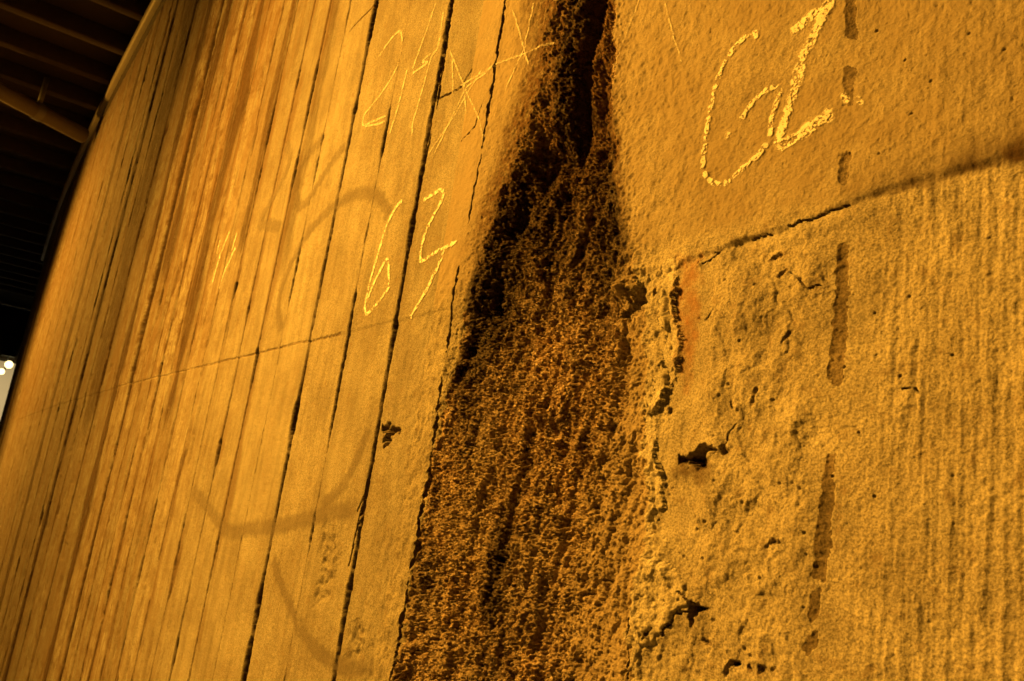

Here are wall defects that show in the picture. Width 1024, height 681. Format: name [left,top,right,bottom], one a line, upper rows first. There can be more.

leakage [454,0,626,394]
spalling [391,0,710,681]
hole [678,442,730,469]
crack [754,204,851,241]